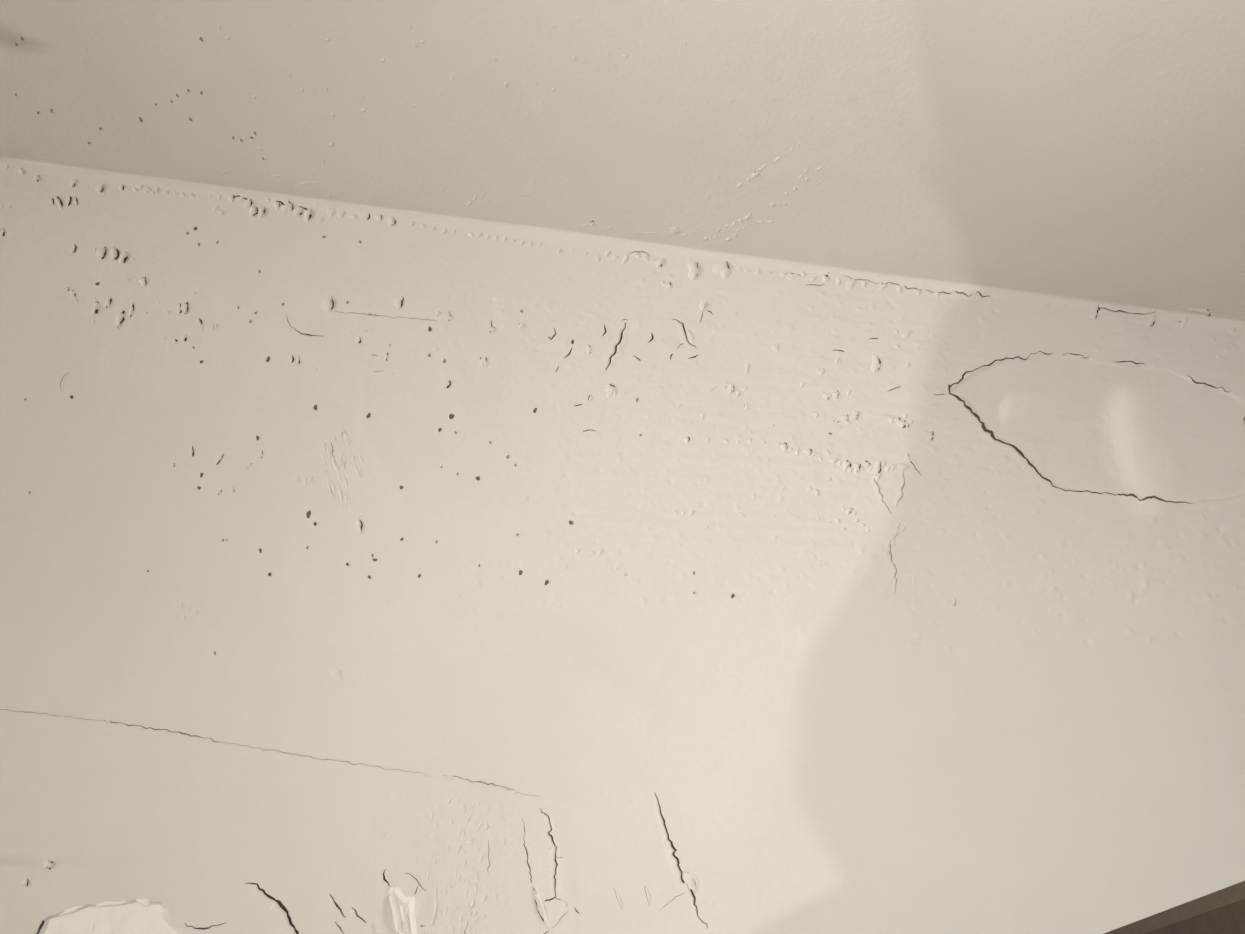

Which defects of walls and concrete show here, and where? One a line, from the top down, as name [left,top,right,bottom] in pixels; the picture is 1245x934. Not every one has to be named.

flaking render [49,179,78,210]
peeling [213,194,542,248]
flaking render [93,246,136,264]
flaking render [91,281,198,330]
peeling [870,453,923,594]
crack [0,709,580,934]
crack [652,792,708,929]
peeling [32,896,185,934]